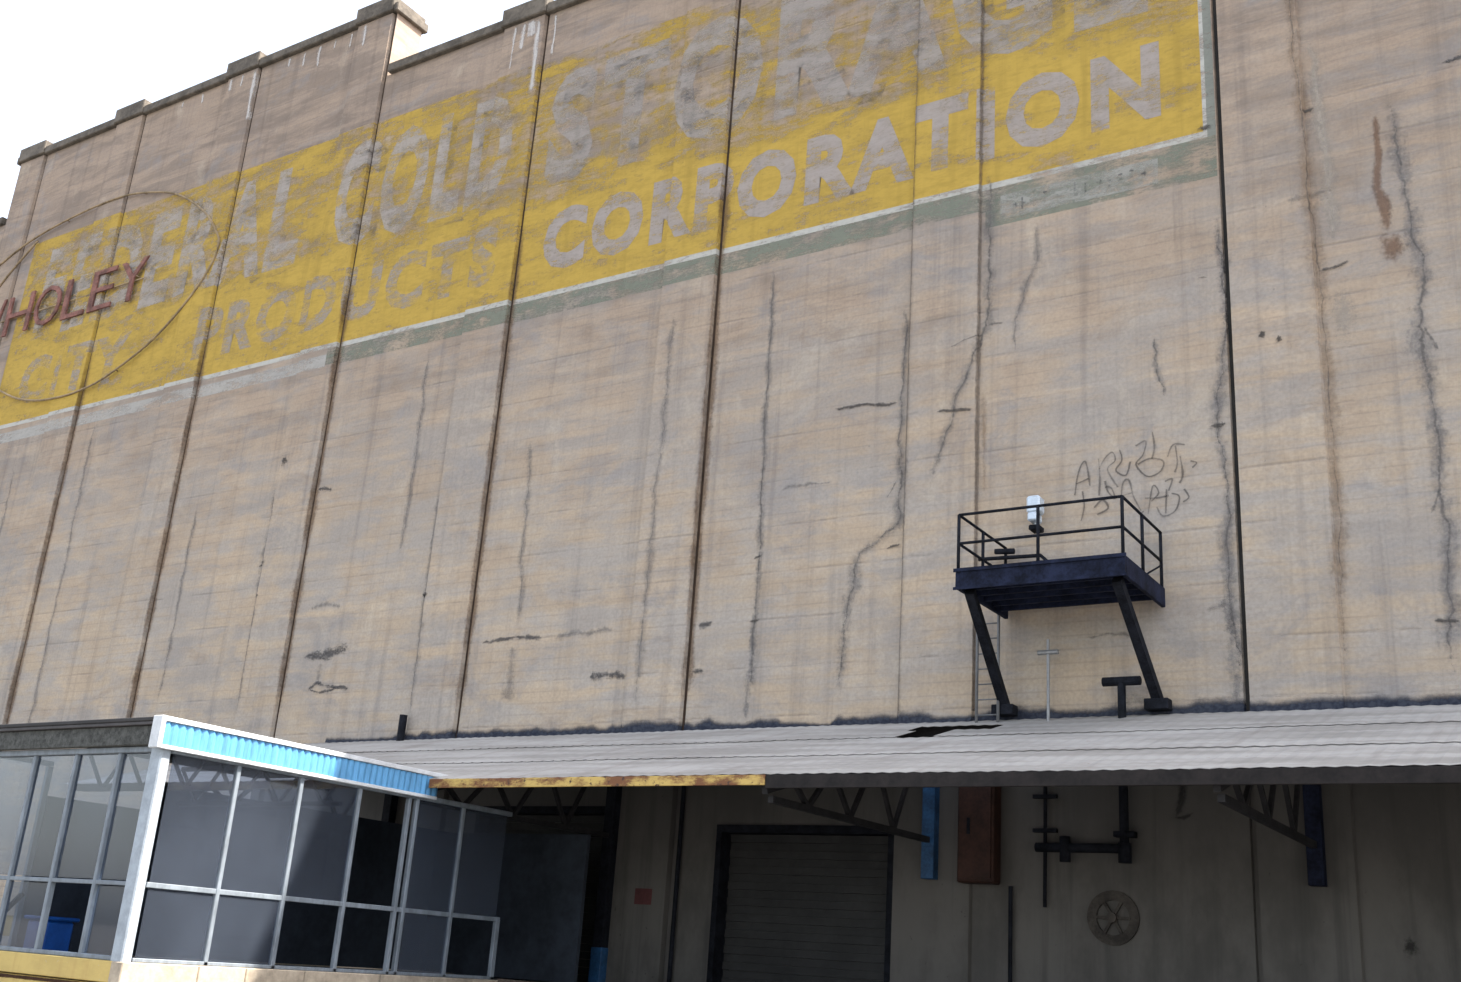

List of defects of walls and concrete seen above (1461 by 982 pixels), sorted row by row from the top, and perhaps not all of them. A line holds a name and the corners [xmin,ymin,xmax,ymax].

crack [837,333,907,549]
crack [939,235,1001,451]
crack [1394,134,1456,635]